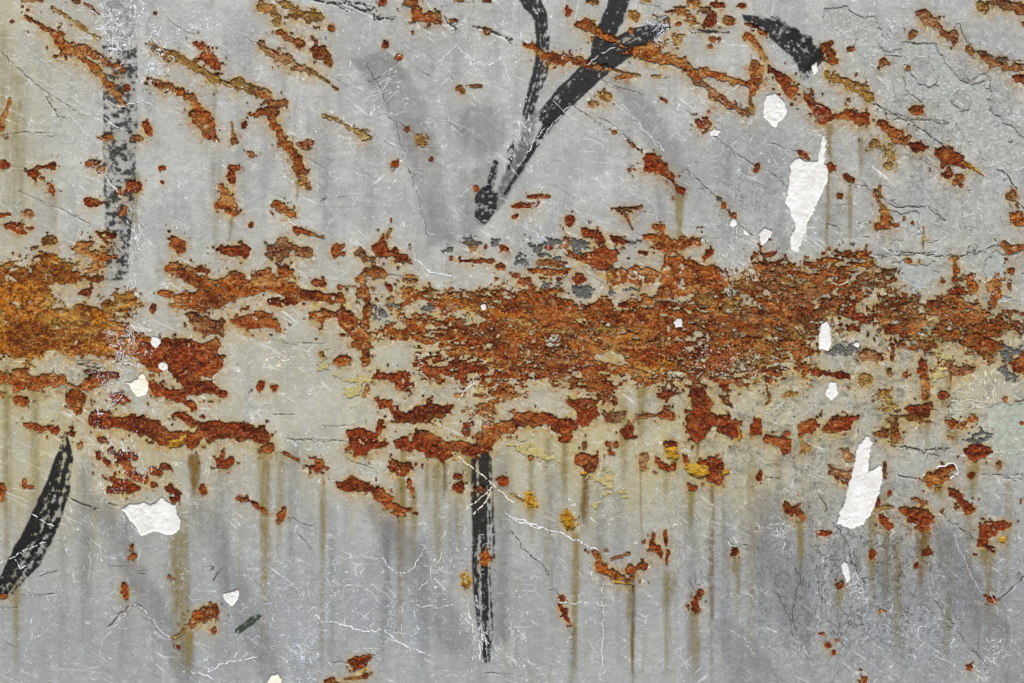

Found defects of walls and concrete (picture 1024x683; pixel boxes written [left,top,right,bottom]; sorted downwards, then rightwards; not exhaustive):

corrosion [904,8,1024,84]
corrosion [9,0,314,228]
corrosion [522,0,985,219]
peeling [763,93,787,127]
peeling [785,134,828,252]
corrosion [0,126,1024,666]
peeling [122,497,181,536]
peeling [837,435,883,529]